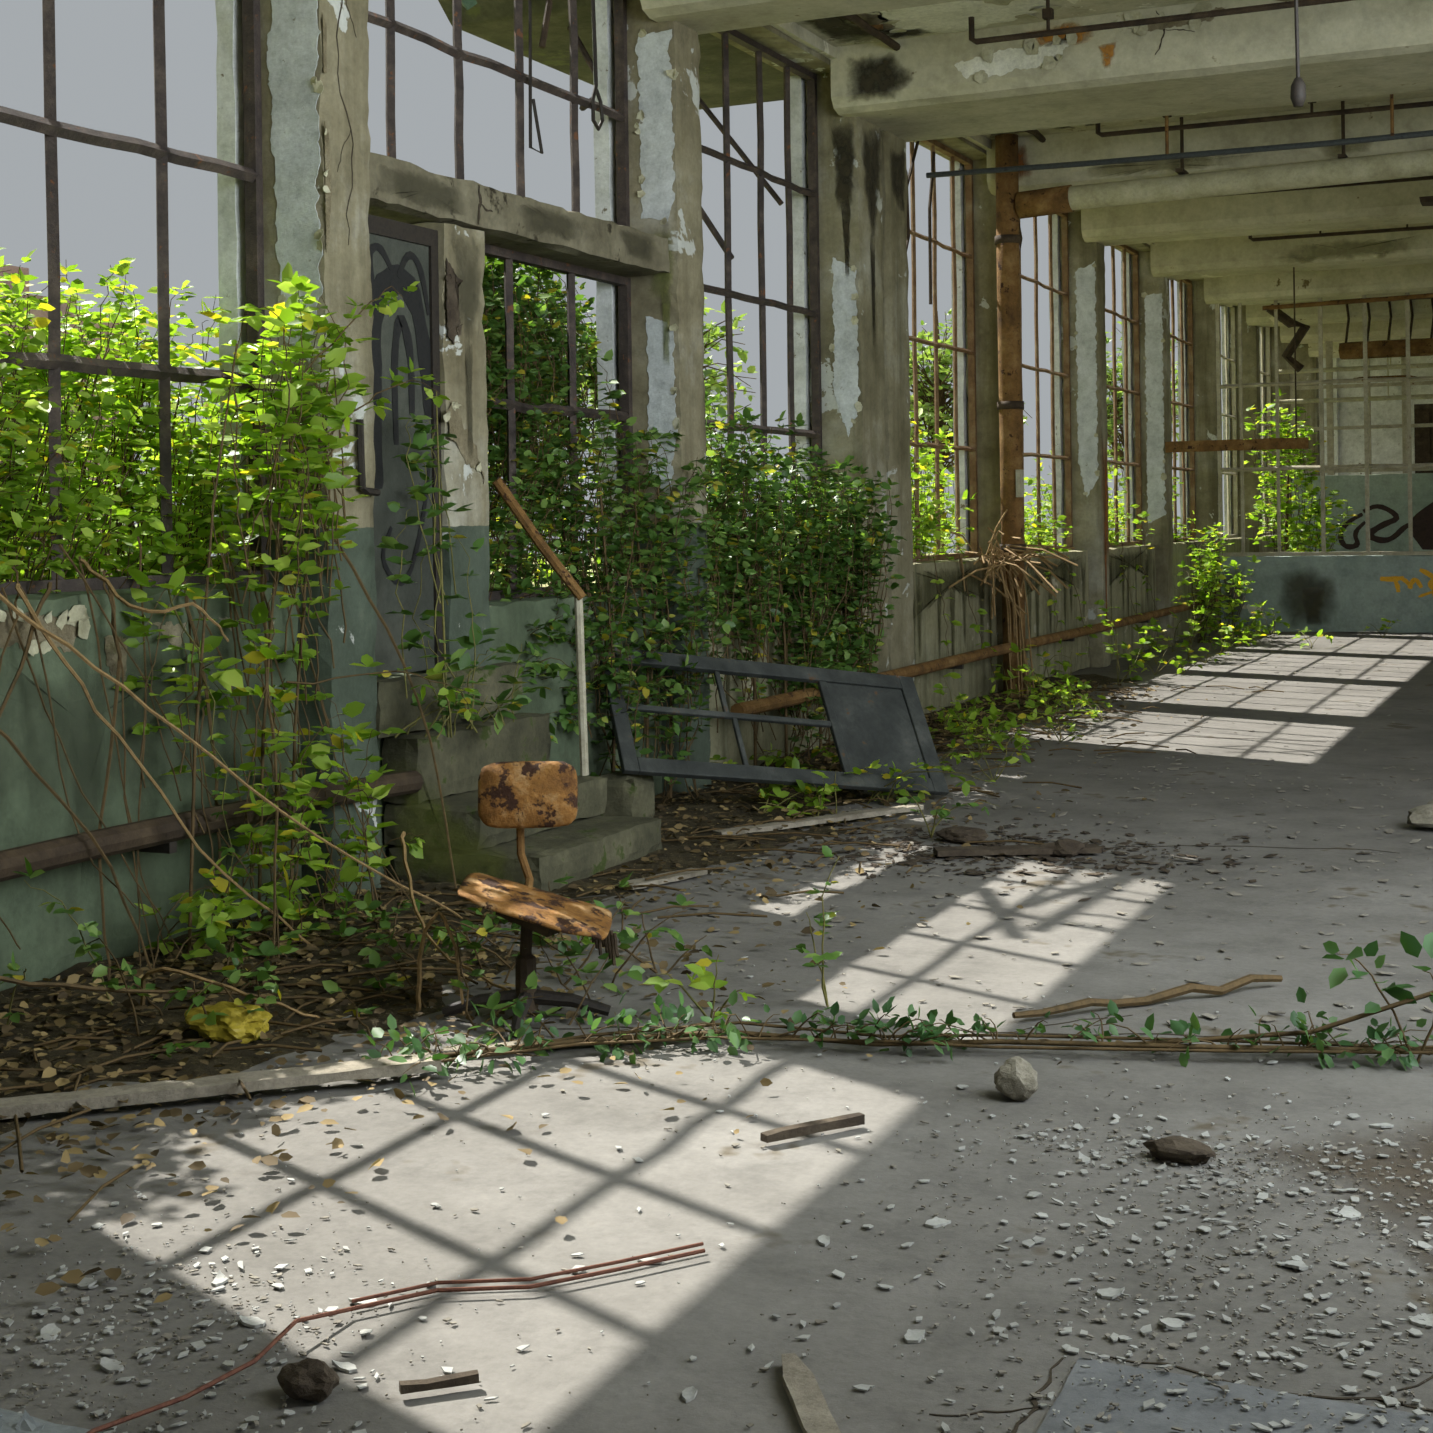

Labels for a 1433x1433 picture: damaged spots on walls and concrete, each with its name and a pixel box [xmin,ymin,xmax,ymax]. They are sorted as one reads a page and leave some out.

mould [805,16,930,42]
mould [853,57,910,98]
peeling [838,0,1062,33]
peeling [955,33,1078,84]
peeling [634,29,678,225]
leakage [832,129,905,330]
peeling [829,257,863,437]
peeling [645,316,679,496]
peeling [0,605,127,681]
peeling [151,621,186,651]
crack [929,1357,1064,1433]